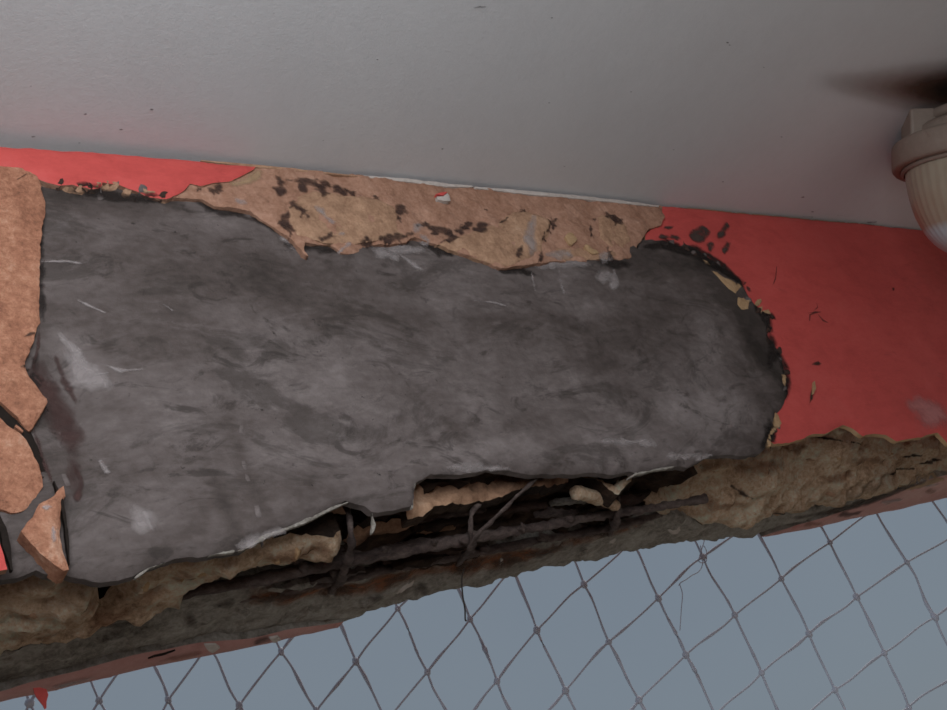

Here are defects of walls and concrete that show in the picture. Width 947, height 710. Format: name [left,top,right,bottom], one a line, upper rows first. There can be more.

crack [0,405,70,573]
rust [254,539,585,604]
spalling [0,166,947,655]